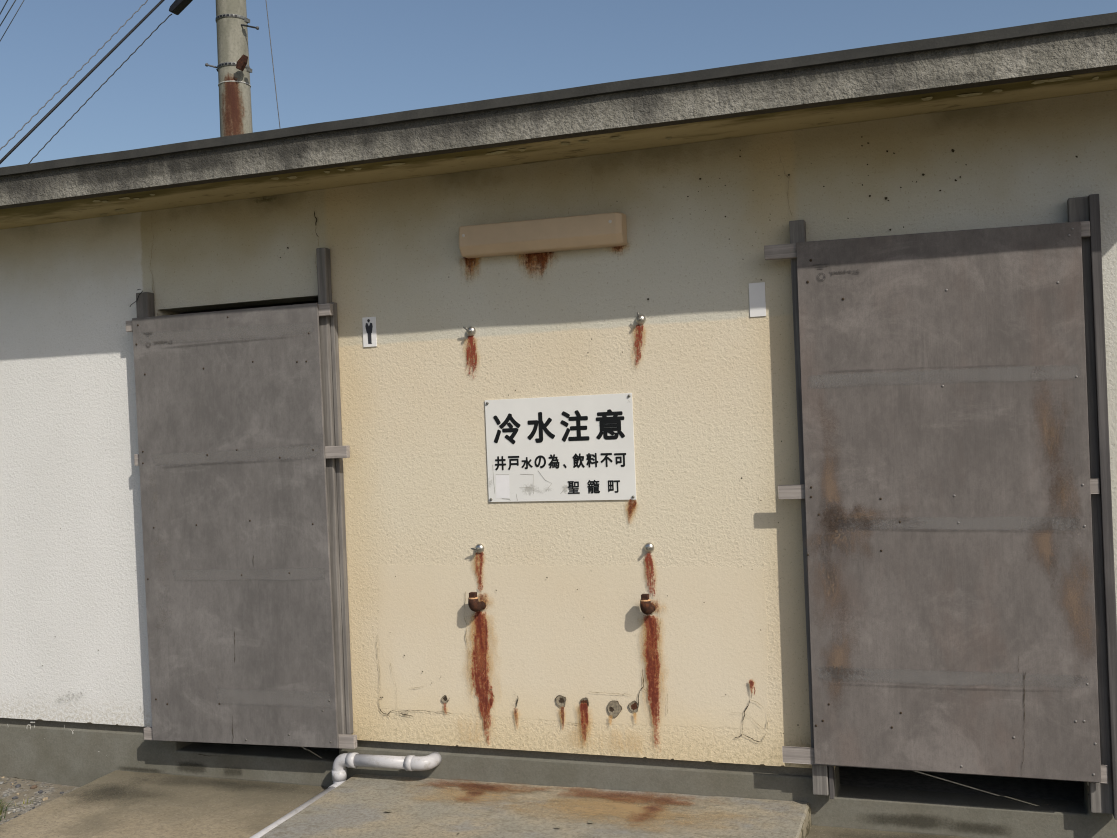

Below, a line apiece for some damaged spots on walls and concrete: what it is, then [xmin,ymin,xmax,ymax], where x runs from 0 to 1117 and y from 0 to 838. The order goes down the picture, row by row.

rust [463,257,480,273]
rust [519,252,552,273]
rust [467,336,477,379]
rust [634,325,645,365]
rust [468,552,494,744]
rust [640,553,660,744]
rust [580,703,589,741]
crack [735,697,769,742]